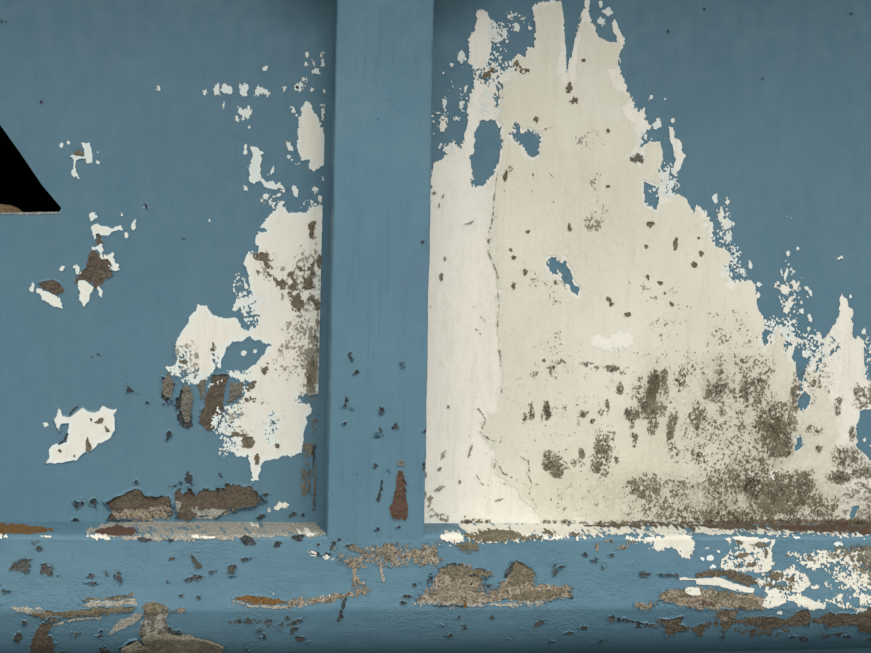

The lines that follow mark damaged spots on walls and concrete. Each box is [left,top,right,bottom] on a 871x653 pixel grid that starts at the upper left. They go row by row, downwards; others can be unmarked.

peeling [203,83,270,129]
peeling [59,141,100,181]
water stain [584,173,608,231]
peeling [29,211,138,309]
peeling [71,144,325,548]
peeling [227,0,871,647]
peeling [43,404,119,465]
water stain [522,306,871,525]
rust [388,458,410,522]
rust [0,522,53,539]
peeling [7,538,63,579]
peeling [0,553,253,653]